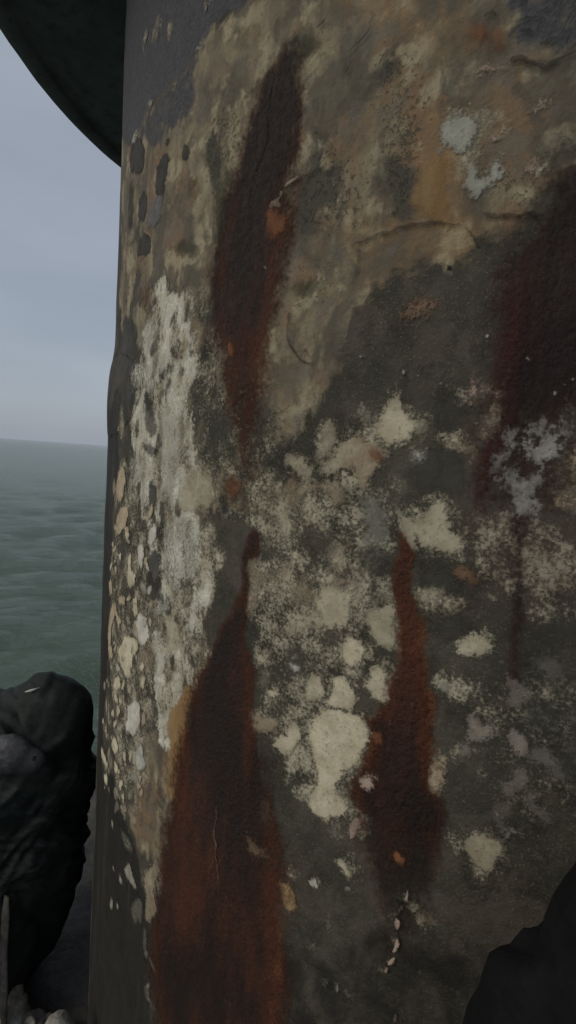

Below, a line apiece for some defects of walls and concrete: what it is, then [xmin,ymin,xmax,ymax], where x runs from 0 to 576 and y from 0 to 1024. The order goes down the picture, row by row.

corrosion [210,36,304,438]
leakage [411,448,466,494]
leakage [524,440,576,473]
leakage [162,518,201,590]
corrosion [166,686,193,799]
corrosion [350,533,446,915]